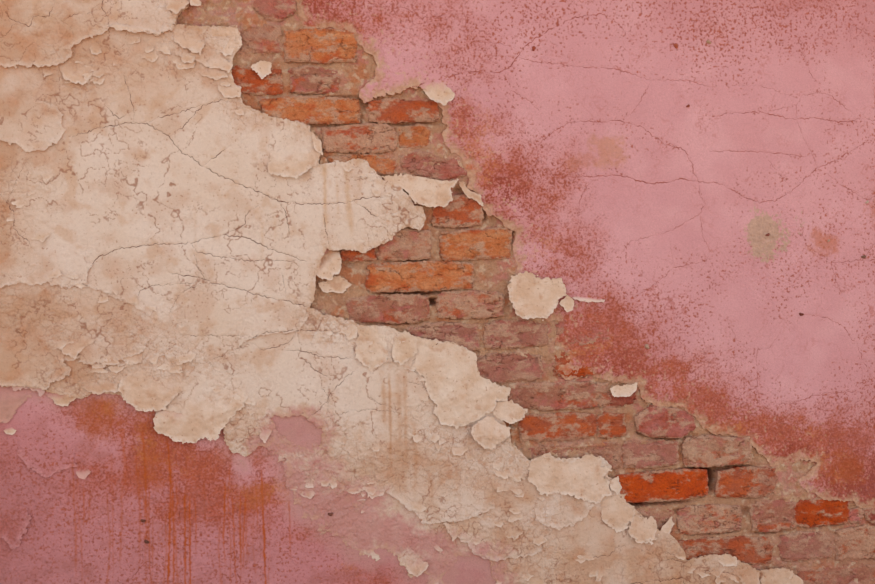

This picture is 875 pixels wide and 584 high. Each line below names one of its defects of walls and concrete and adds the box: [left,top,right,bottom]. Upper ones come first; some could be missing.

crack [76,82,380,307]
crack [191,329,397,414]
spalling [176,0,875,584]
crack [408,13,875,296]
rust [68,391,198,584]
rust [221,475,292,512]